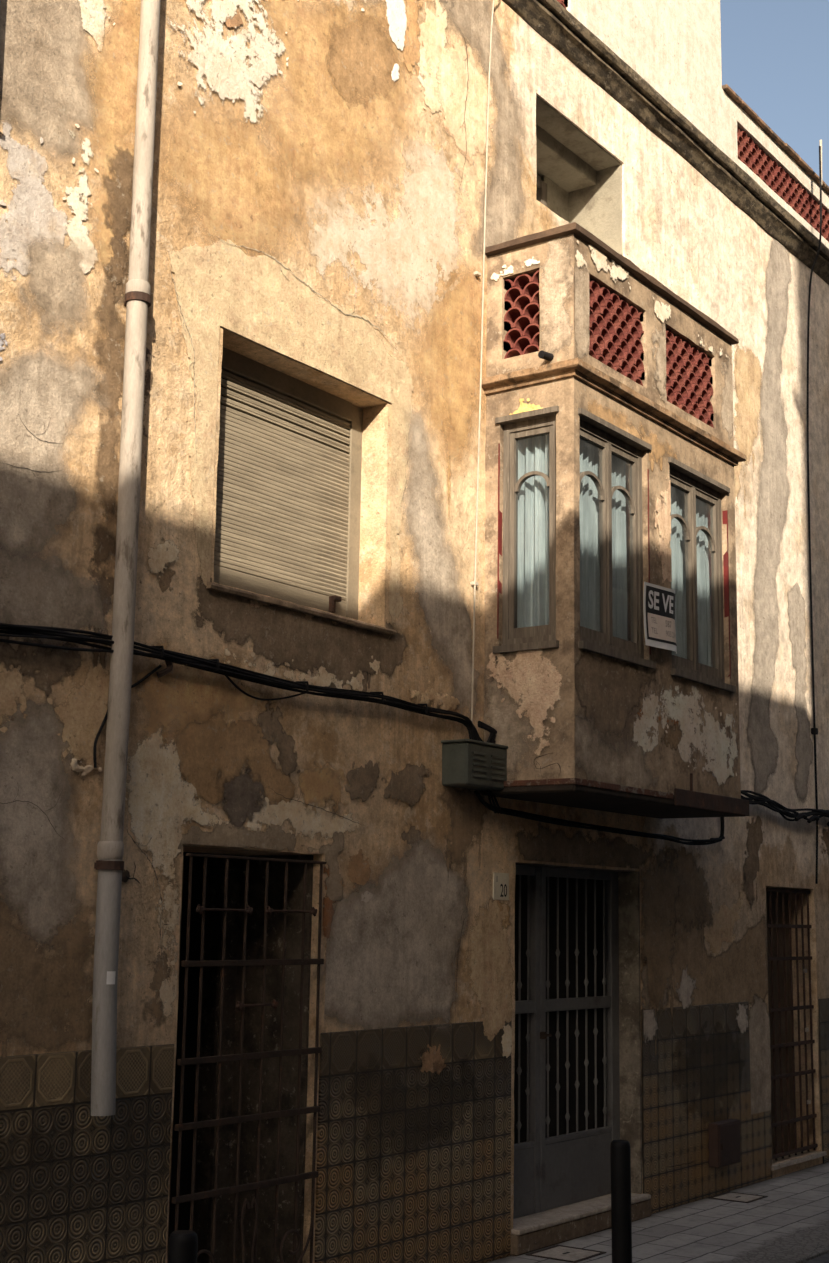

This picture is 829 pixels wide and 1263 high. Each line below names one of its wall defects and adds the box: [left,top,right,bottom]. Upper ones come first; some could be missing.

peeling [78,0,116,52]
peeling [168,0,289,123]
water stain [167,0,423,257]
peeling [386,0,493,164]
peeling [62,124,99,274]
water stain [0,0,141,698]
water stain [192,576,408,692]
peeling [486,649,563,755]
peeling [631,685,738,786]
peeling [125,712,359,1017]
spalling [644,1009,658,1043]